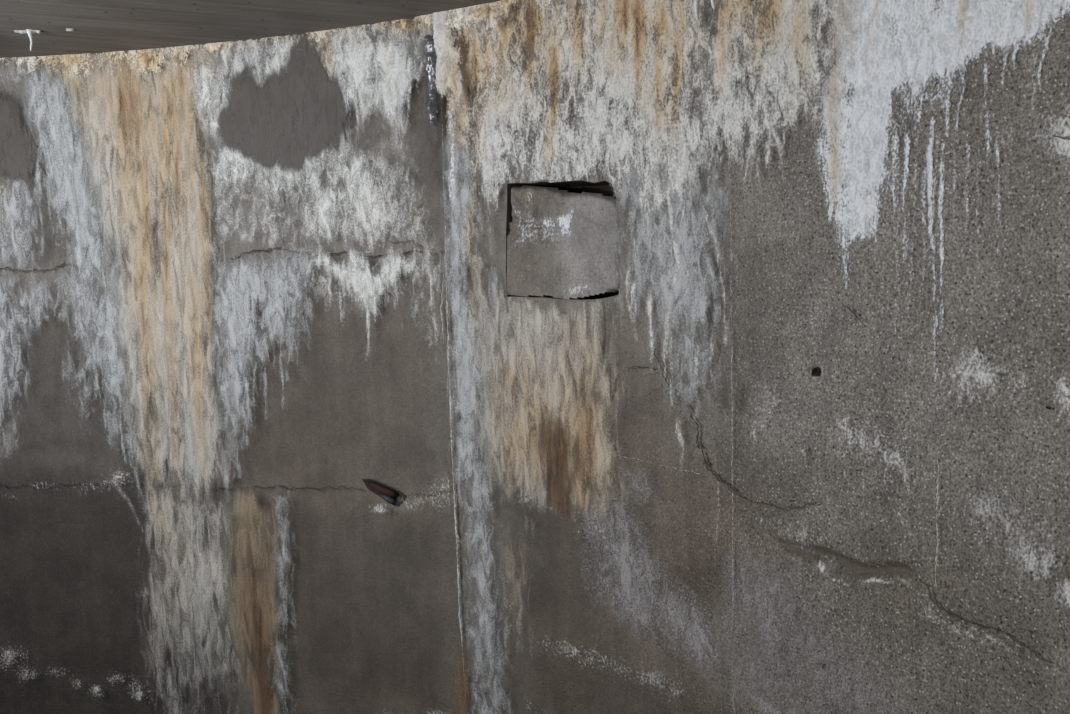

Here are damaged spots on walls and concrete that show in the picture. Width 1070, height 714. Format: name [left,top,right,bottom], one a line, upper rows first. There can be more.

water stain [902,134,910,212]
water stain [915,117,951,300]
water stain [966,113,1011,176]
water stain [1035,106,1070,157]
crack [0,263,117,272]
water stain [0,279,56,444]
water stain [934,349,1006,402]
rust [546,420,577,509]
water stain [827,418,910,491]
water stain [971,491,1061,579]
water stain [1055,578,1070,608]
water stain [730,559,902,714]